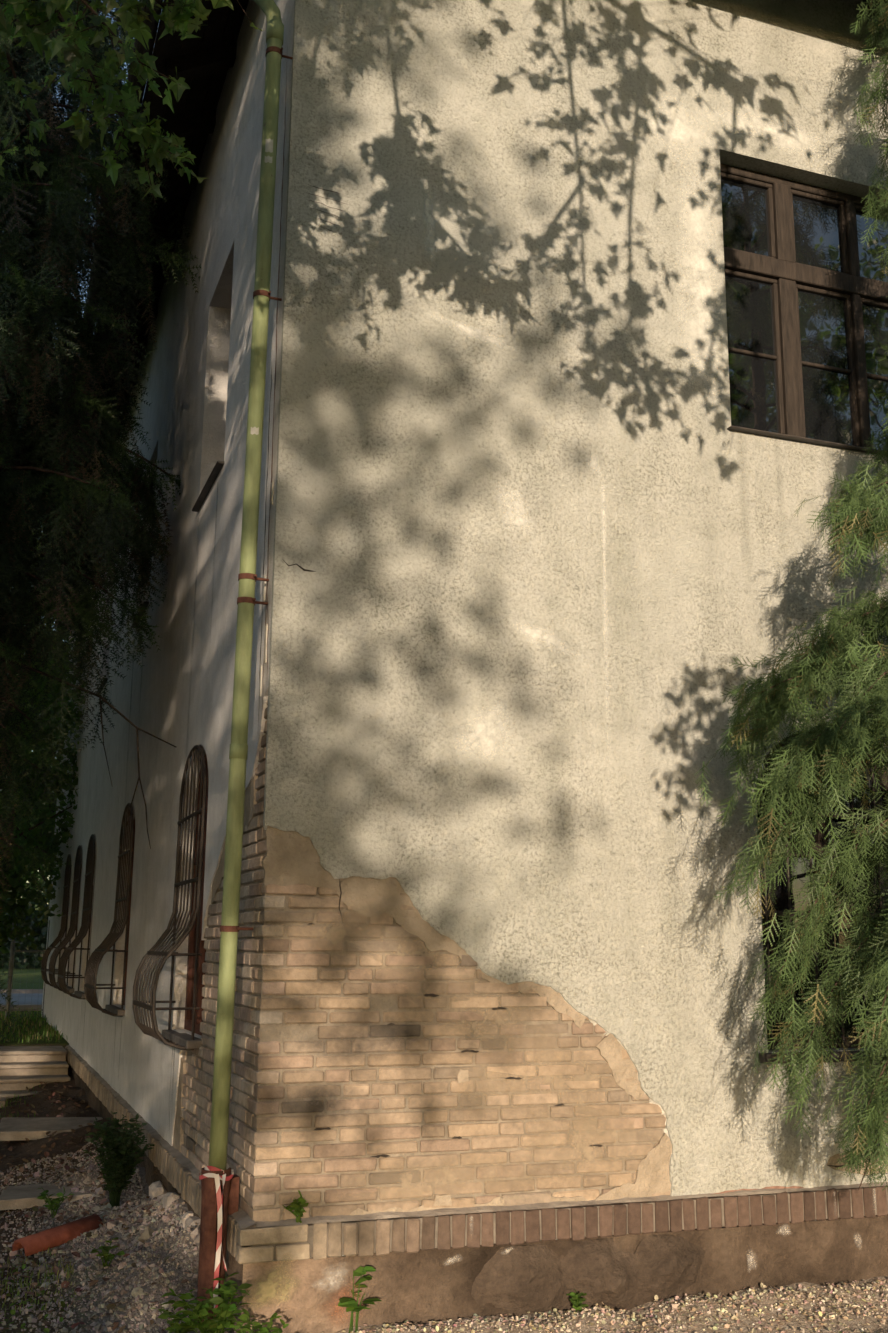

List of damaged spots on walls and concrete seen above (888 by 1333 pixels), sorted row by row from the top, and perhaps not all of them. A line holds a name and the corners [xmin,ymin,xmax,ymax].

spalling [173,843,225,1171]
spalling [227,700,672,1221]
spalling [826,1151,888,1175]